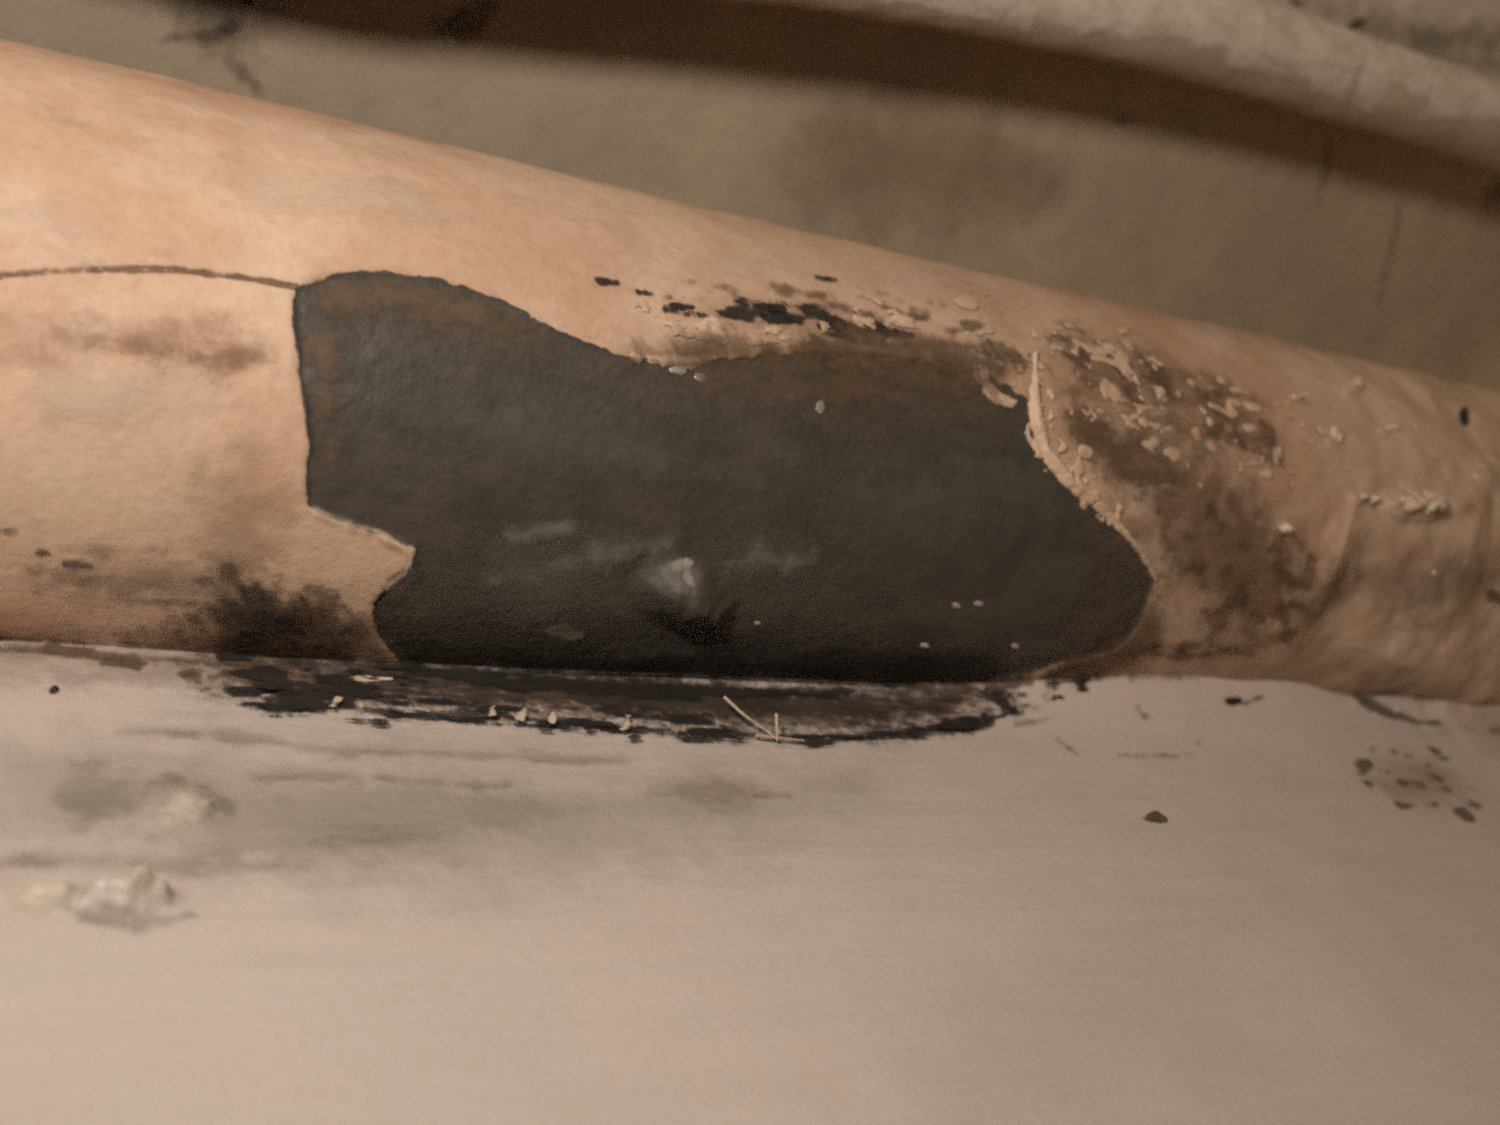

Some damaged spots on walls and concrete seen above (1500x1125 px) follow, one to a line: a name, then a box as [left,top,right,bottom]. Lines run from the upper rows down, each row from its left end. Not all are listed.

crack [0,265,298,289]
spalling [292,270,1347,688]
peeling [1459,407,1469,426]
damp [0,549,1120,746]